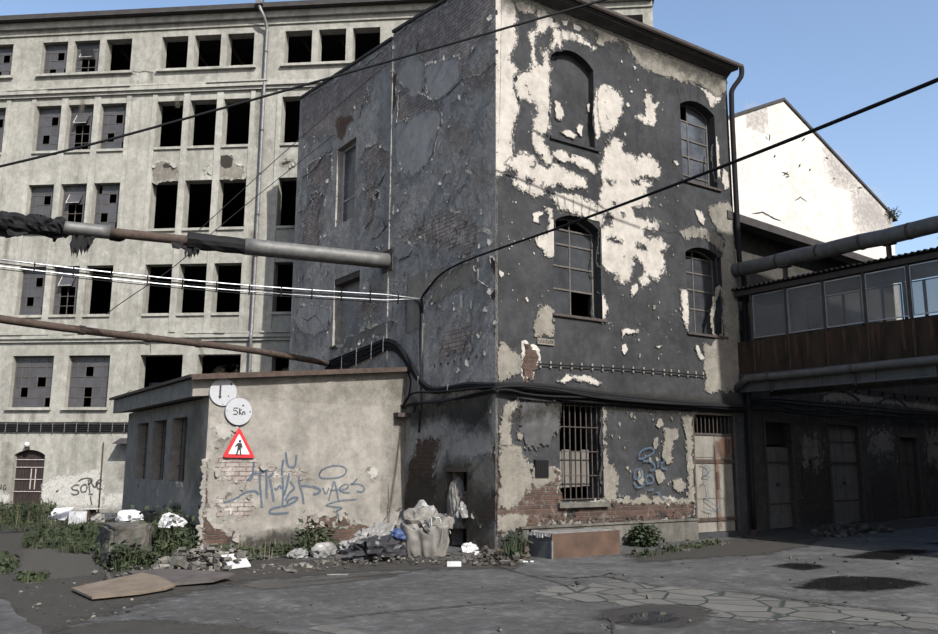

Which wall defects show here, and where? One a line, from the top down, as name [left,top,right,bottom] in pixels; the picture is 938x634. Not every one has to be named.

crack [416,44,501,163]
peeling [152,159,179,185]
peeling [202,153,247,181]
spalling [196,418,313,549]
spalling [294,394,696,543]